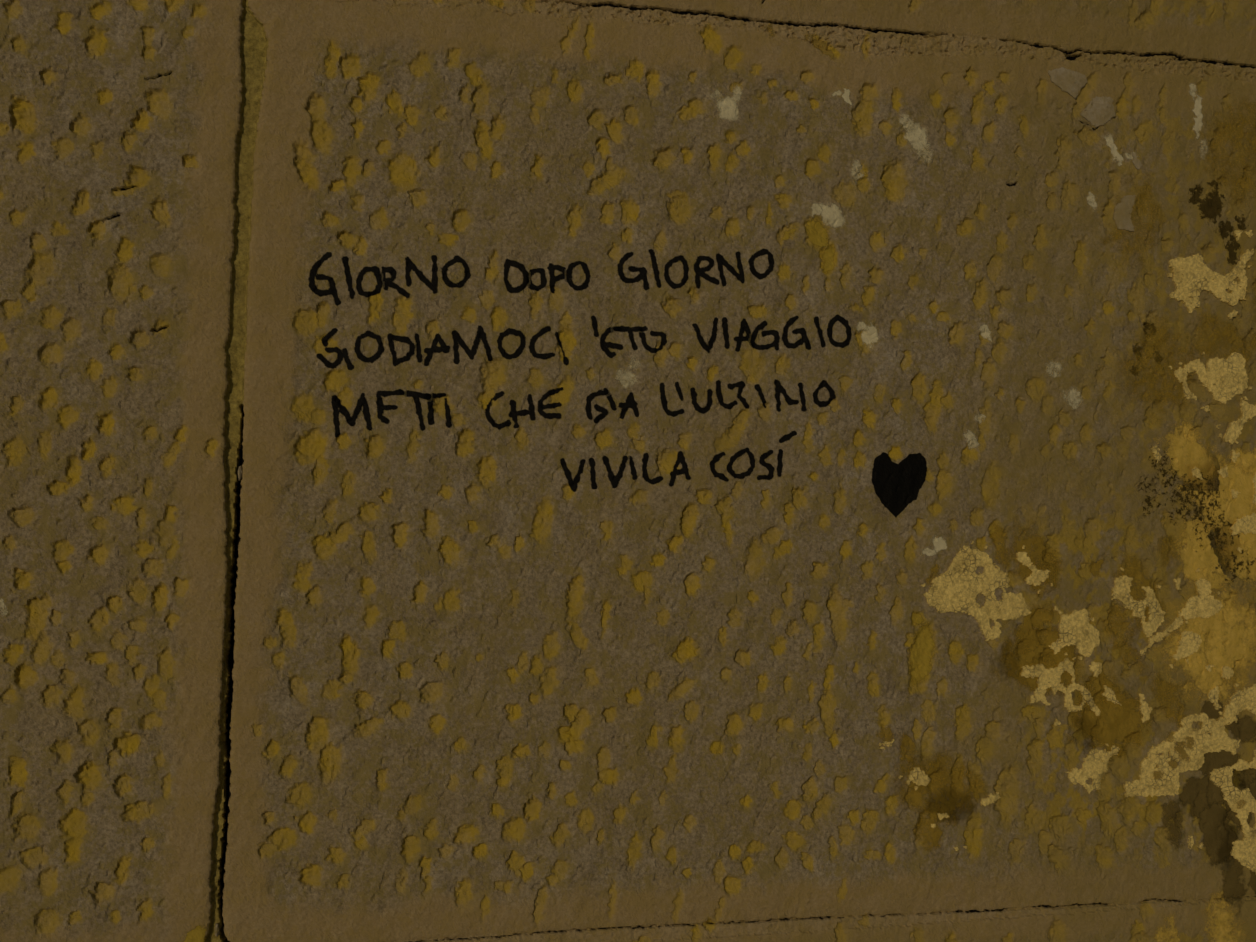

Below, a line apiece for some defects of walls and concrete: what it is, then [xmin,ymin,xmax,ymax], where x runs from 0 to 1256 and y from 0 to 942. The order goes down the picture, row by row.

leakage [1188,84,1256,265]
peeling [1167,230,1254,319]
leakage [1125,315,1256,402]
peeling [1168,352,1256,553]
peeling [910,541,1053,684]
peeling [1021,606,1122,726]
peeling [1111,567,1223,668]
peeling [898,767,931,790]
peeling [980,792,1001,806]
peeling [1065,744,1120,794]
peeling [1124,664,1256,875]